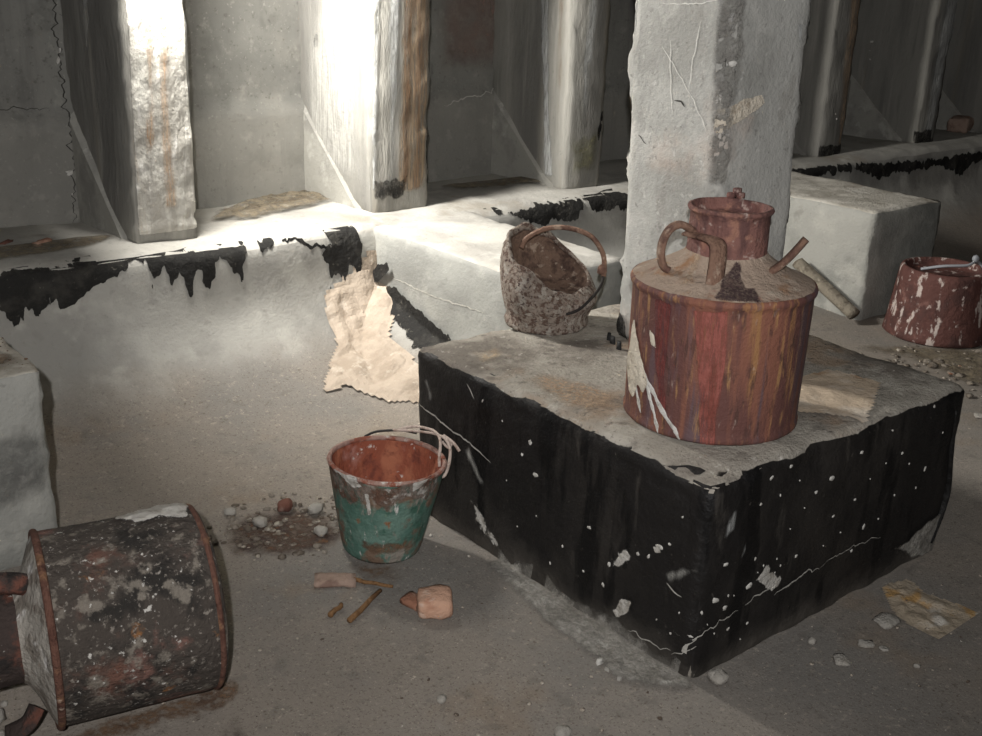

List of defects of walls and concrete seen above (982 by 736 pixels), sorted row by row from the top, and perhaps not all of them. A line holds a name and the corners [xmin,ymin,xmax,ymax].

crack [0,0,77,222]
corrosion [399,0,428,190]
spalling [711,0,744,183]
peeling [257,235,332,253]
crack [628,537,875,654]